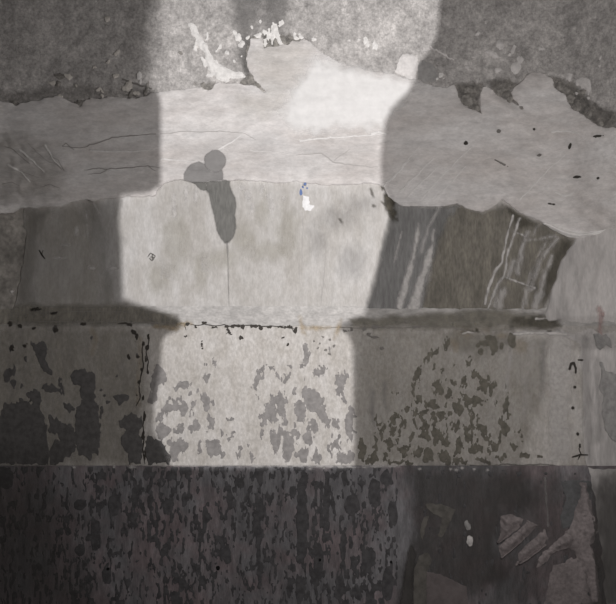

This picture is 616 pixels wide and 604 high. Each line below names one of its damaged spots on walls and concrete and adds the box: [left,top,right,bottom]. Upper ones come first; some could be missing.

spalling [239,34,297,88]
spalling [456,84,481,112]
spalling [491,80,523,110]
spalling [552,78,616,128]
crack [3,131,254,188]
damp [184,150,236,250]
crack [181,323,277,334]
spalling [185,321,298,340]
damp [353,194,572,457]
peeling [0,333,543,604]
peeling [544,482,600,604]